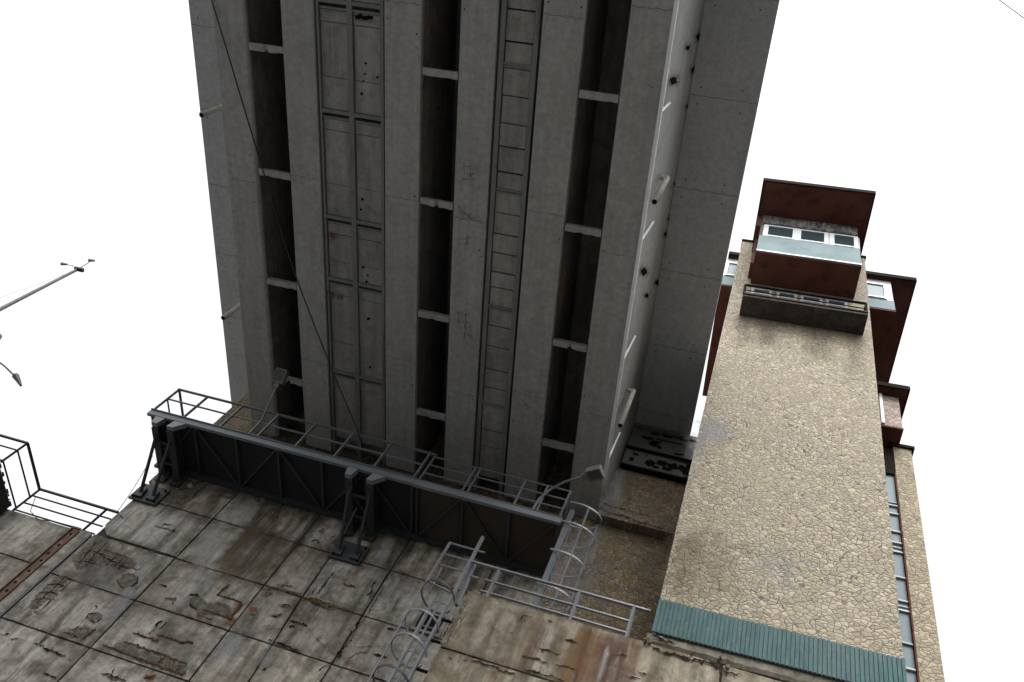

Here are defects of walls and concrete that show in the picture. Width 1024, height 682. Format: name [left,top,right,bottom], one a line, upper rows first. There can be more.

peeling [629,429,696,475]
spalling [26,537,141,616]
spalling [189,584,242,626]